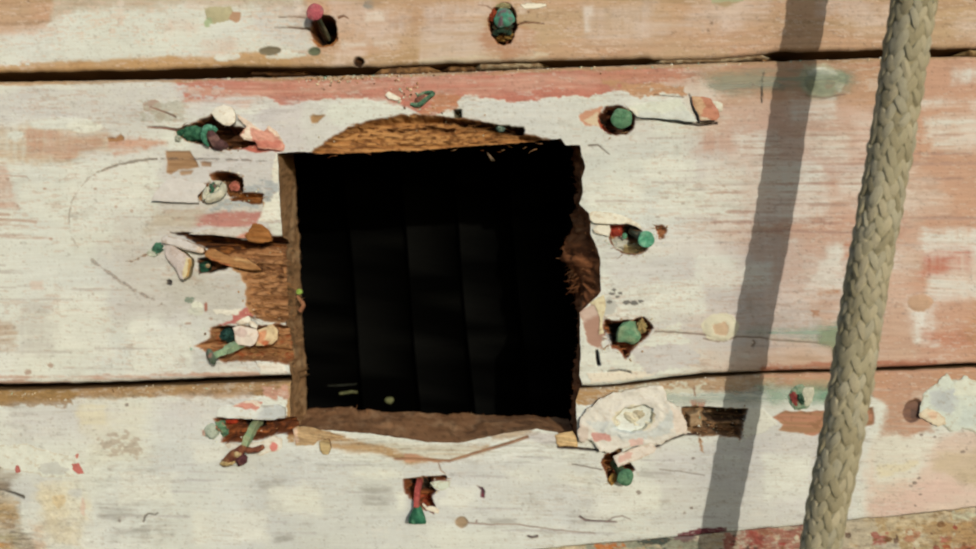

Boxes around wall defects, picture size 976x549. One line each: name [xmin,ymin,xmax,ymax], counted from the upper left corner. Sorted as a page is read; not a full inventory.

peeling [185,57,685,151]
peeling [626,96,723,122]
peeling [151,150,212,203]
peeling [190,227,249,238]
peeling [590,295,606,335]
crack [654,330,830,349]
peeling [216,400,286,420]
peeling [918,373,976,434]
peeling [0,443,84,478]
peeling [225,435,283,456]
crack [394,435,530,475]
peeling [430,480,450,490]